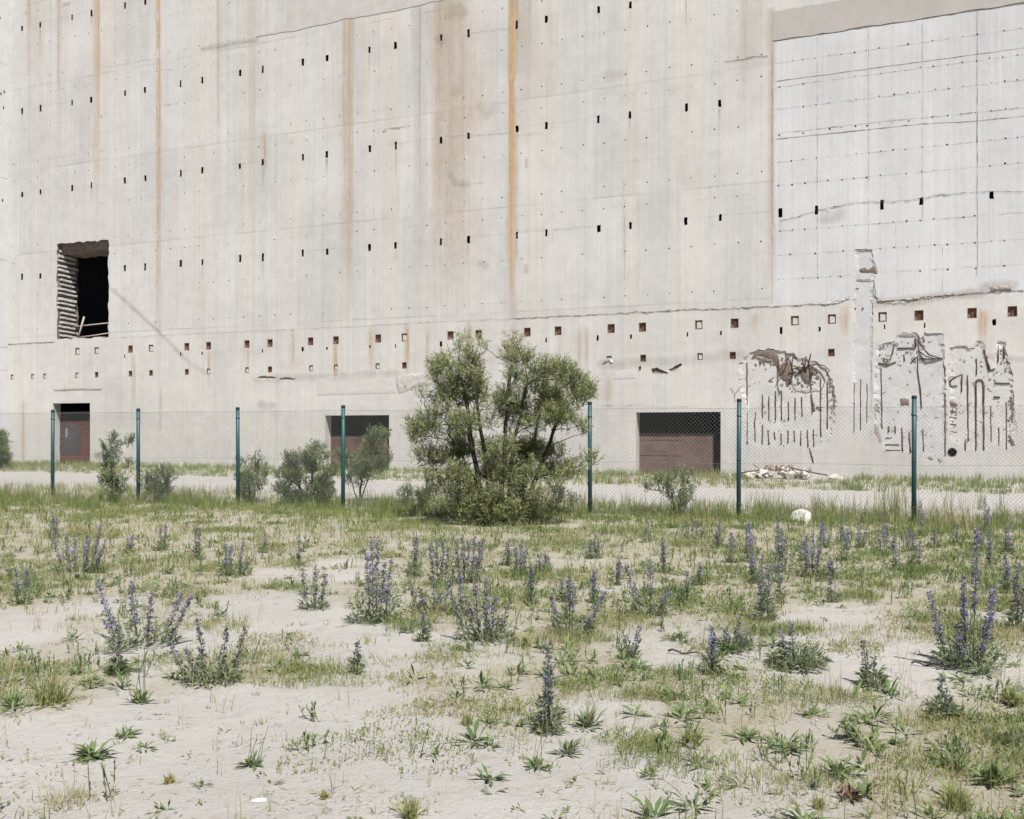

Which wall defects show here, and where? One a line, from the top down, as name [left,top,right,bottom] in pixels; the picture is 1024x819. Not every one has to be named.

crack [780,191,1024,221]
spalling [855,266,877,289]
spalling [738,348,837,463]
spalling [853,332,1018,462]